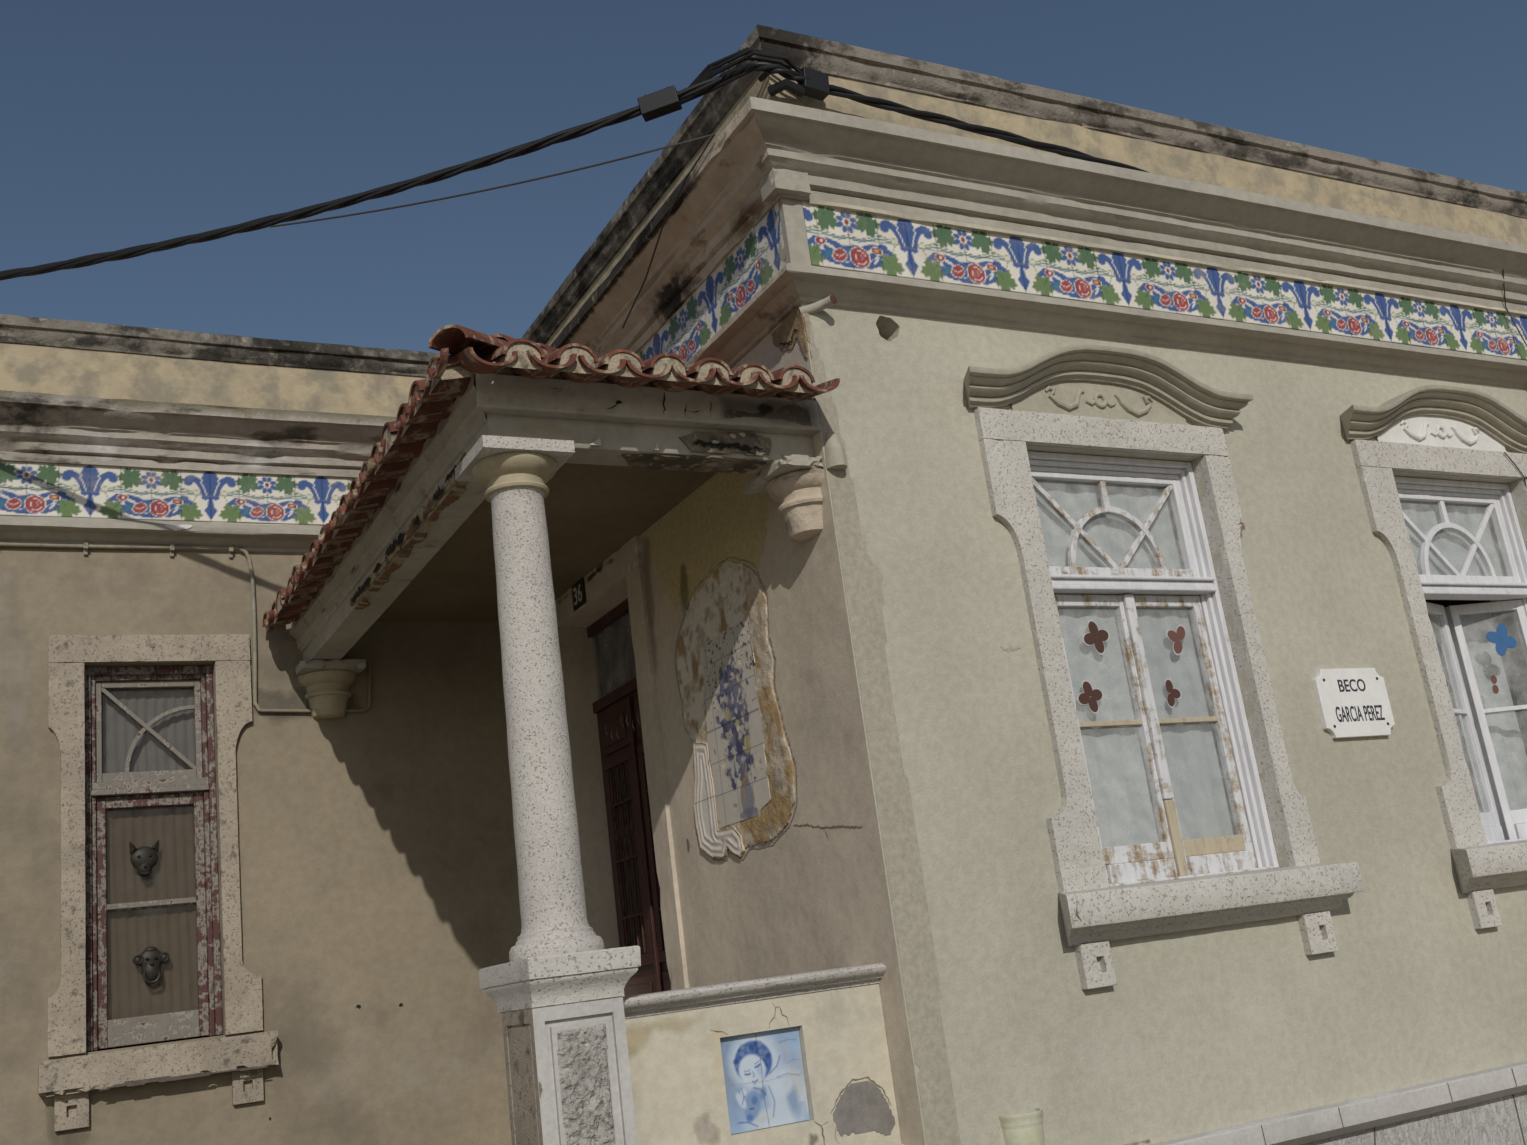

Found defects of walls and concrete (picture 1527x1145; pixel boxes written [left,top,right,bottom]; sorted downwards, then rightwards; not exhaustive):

water stain [757,24,819,70]
water stain [550,169,695,349]
water stain [254,339,374,373]
flaking render [621,404,812,474]
flaking render [674,556,798,861]
crack [793,824,863,837]